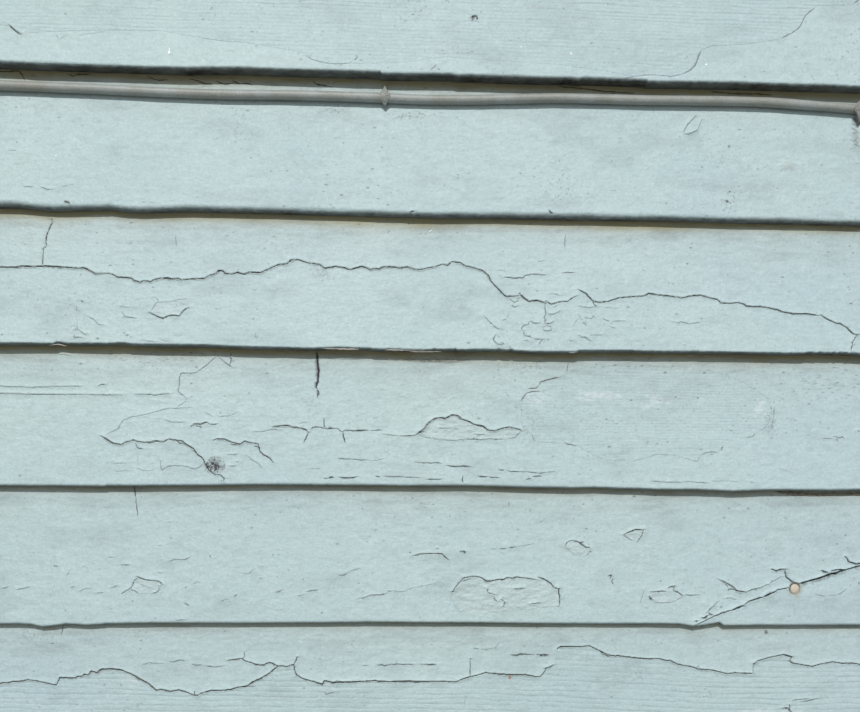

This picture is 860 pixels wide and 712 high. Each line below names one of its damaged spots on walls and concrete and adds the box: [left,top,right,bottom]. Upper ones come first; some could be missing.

crack [101,352,555,515]
peeling [452,576,560,614]
crack [696,559,860,622]